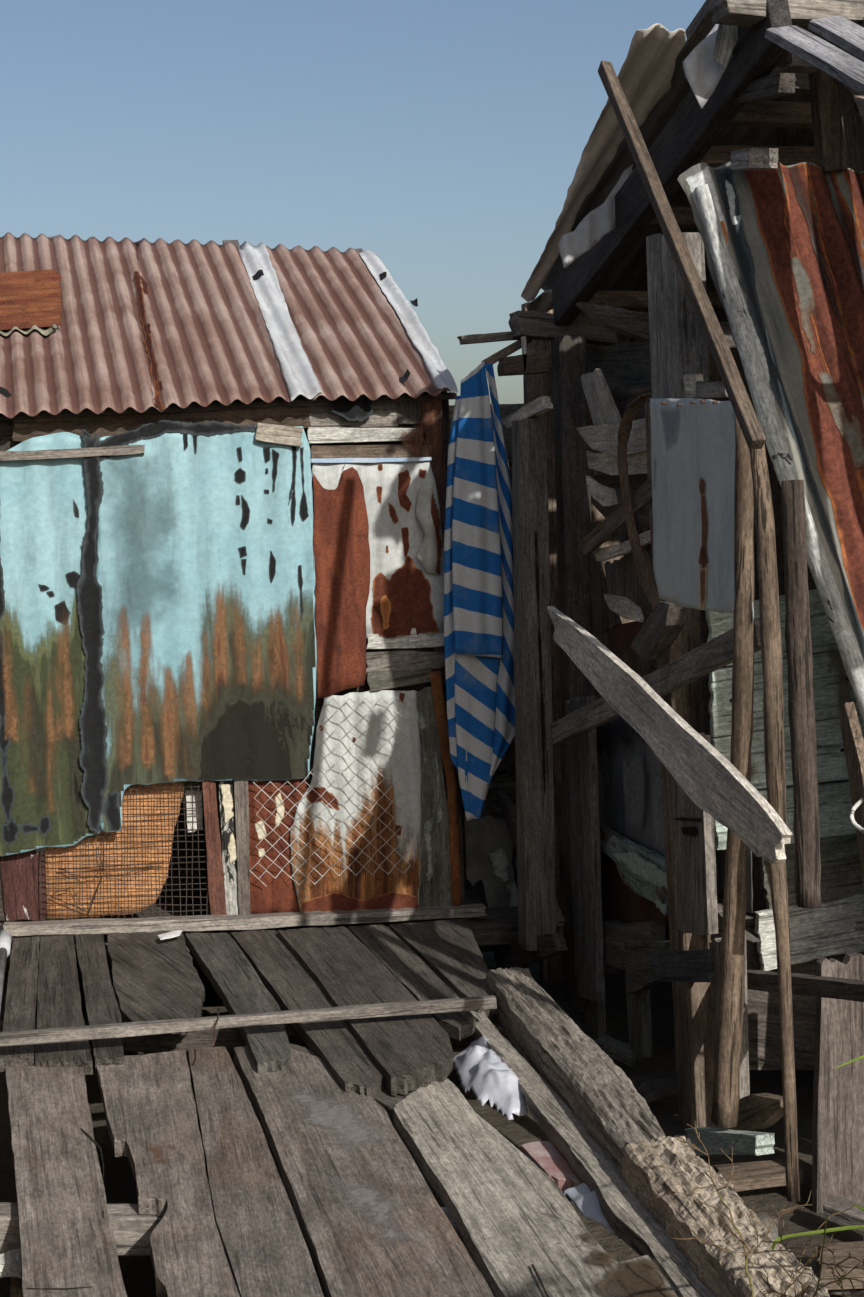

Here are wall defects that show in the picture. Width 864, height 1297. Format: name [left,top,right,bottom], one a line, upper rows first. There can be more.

rust [744,161,864,631]
rust [3,629,74,810]
water stain [0,591,316,856]
rust [119,397,442,778]
rust [248,768,420,914]
rust [698,477,708,610]